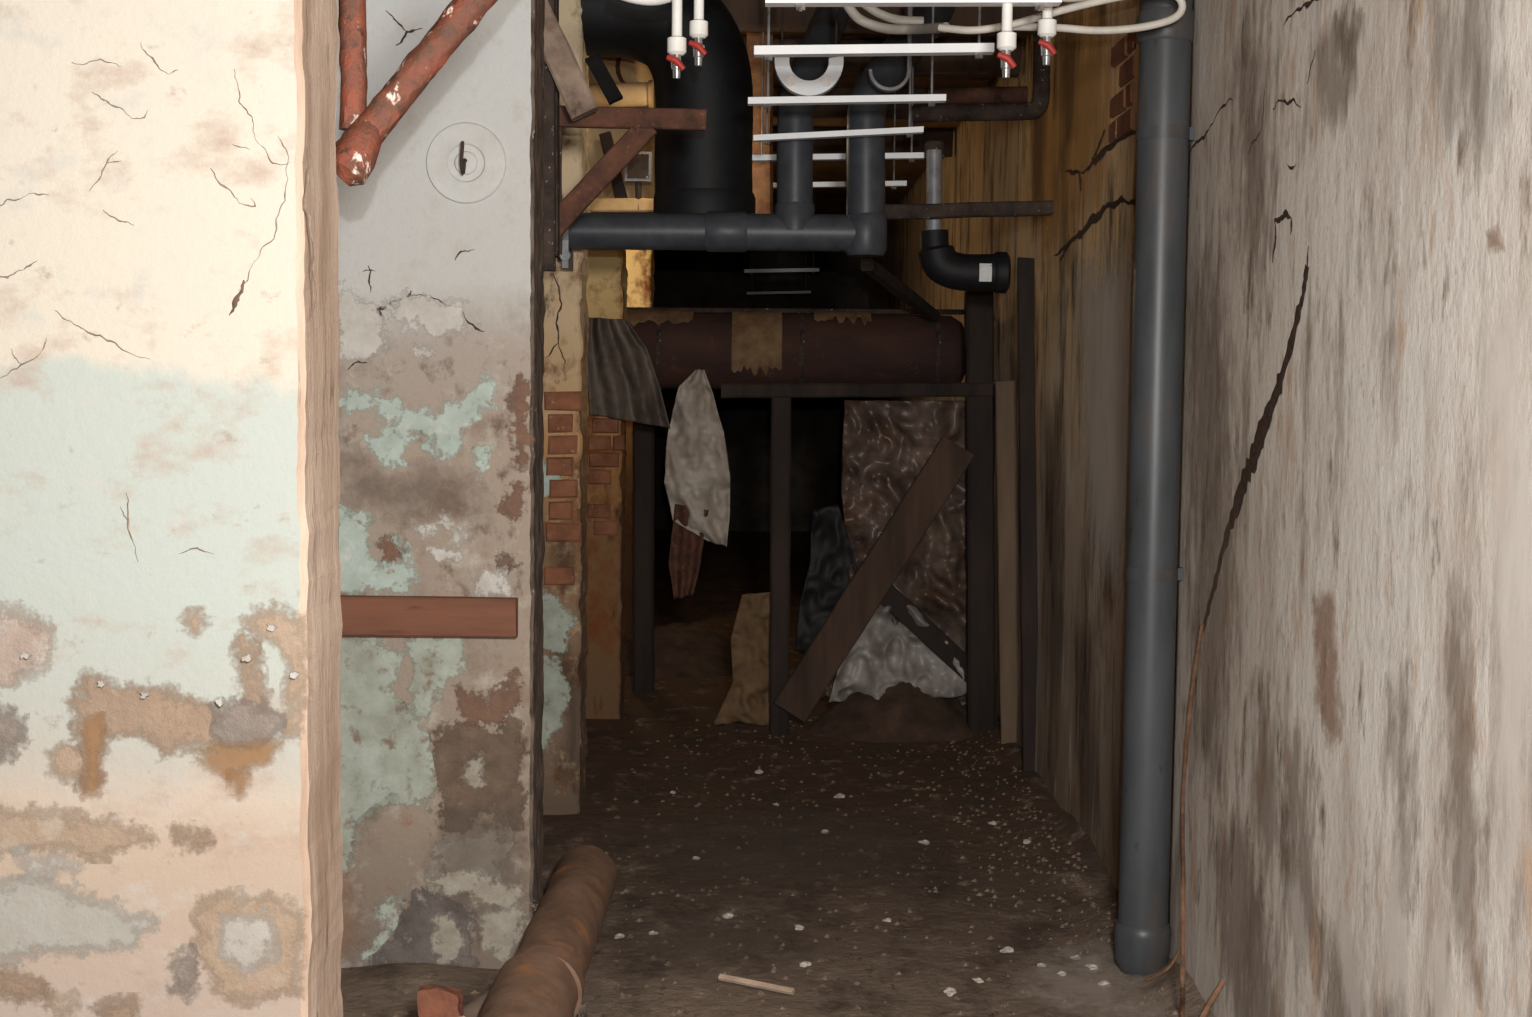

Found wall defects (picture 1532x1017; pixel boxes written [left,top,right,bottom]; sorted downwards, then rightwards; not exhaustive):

crack [72,46,177,119]
crack [210,69,317,320]
crack [1054,129,1136,261]
crack [1,310,149,378]
crack [1203,209,1309,632]
peeling [339,502,472,596]
peeling [474,553,523,597]
water stain [1483,317,1532,872]
peeling [48,603,314,791]
peeling [340,566,578,968]
peeling [0,804,158,1017]
water stain [1338,906,1361,1017]